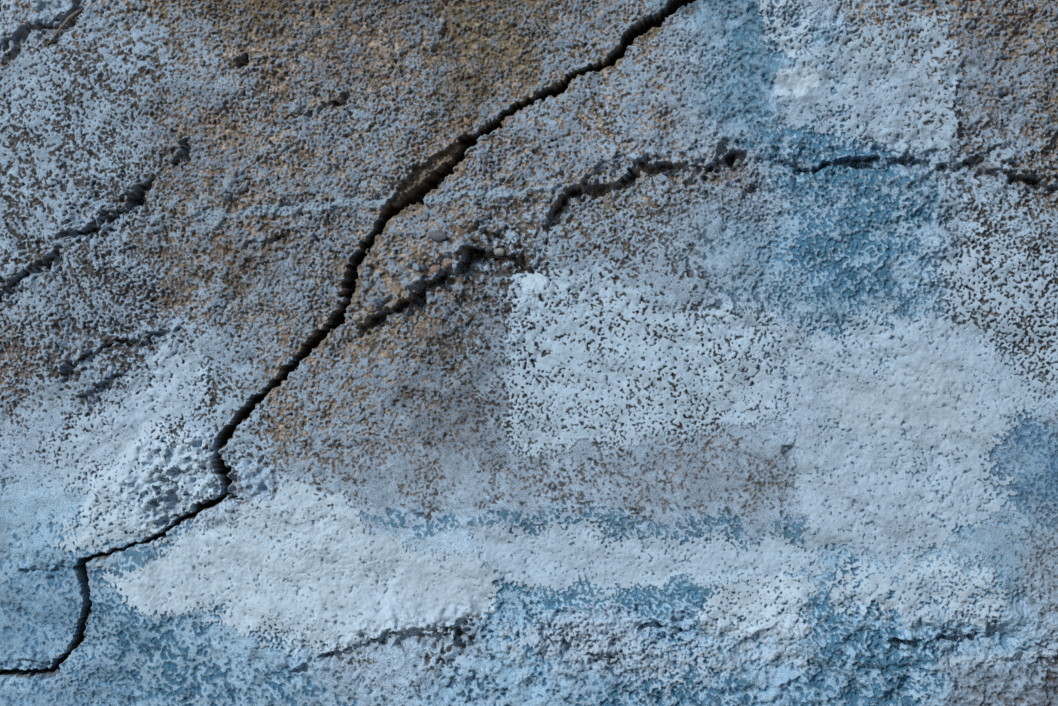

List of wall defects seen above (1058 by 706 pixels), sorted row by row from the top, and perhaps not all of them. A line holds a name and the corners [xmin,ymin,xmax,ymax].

crack [0,0,702,687]